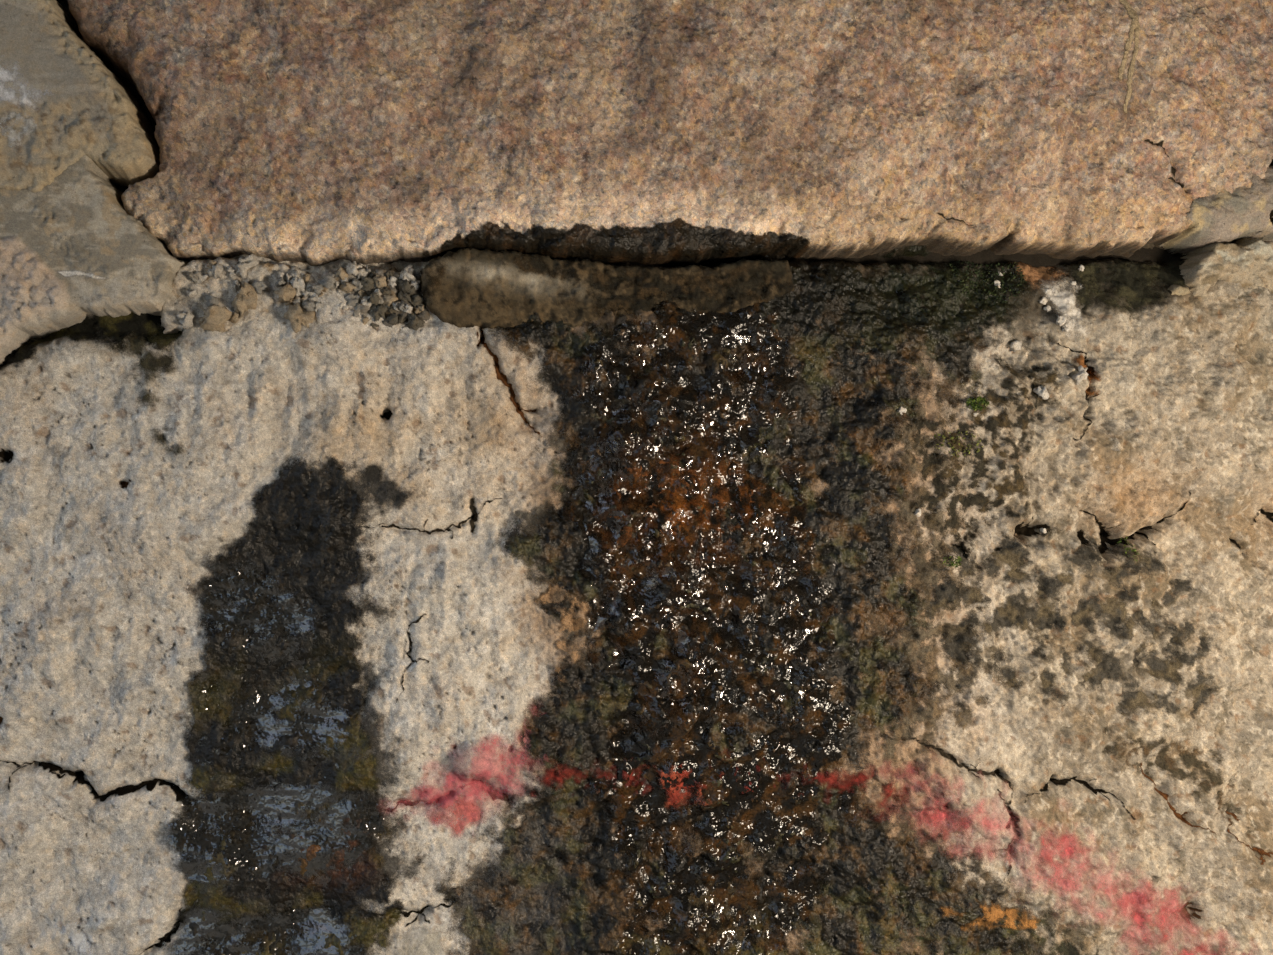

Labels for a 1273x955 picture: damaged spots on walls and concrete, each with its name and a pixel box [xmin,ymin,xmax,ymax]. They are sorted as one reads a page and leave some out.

crack [477,326,542,437]
crack [359,498,502,539]
crack [1080,492,1191,554]
crack [1229,509,1273,554]
leakage [161,218,1242,955]
crack [3,761,197,805]
crack [913,738,1135,880]